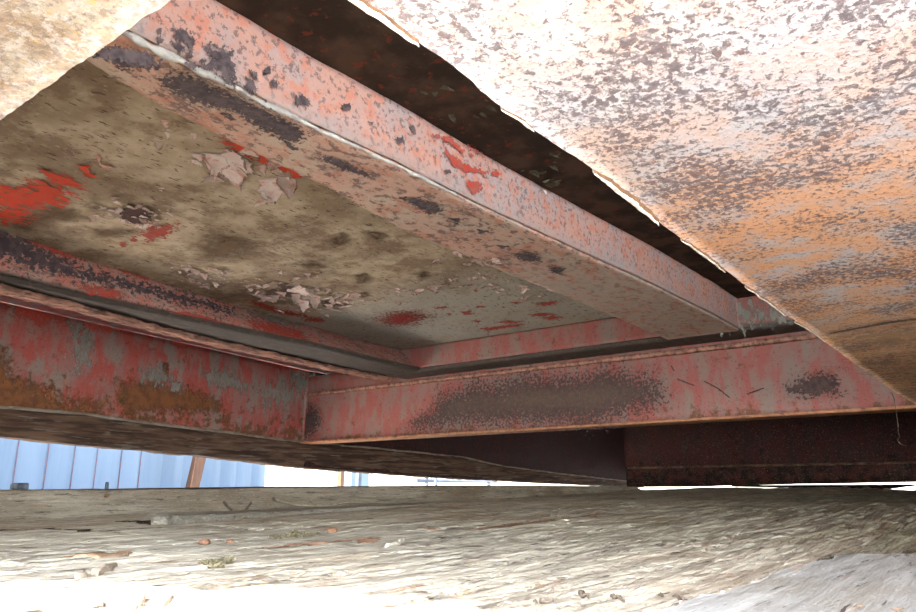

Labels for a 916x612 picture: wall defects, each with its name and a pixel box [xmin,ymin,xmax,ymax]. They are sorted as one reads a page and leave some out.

corrosion [92,26,313,150]
peeling [190,148,302,208]
corrosion [320,154,371,177]
damp [15,207,85,230]
peeling [72,197,174,232]
corrosion [399,196,460,224]
damp [93,229,134,238]
damp [202,236,253,259]
damp [332,234,348,245]
peeling [170,265,232,290]
peeling [240,251,553,327]
corrosion [0,347,223,419]